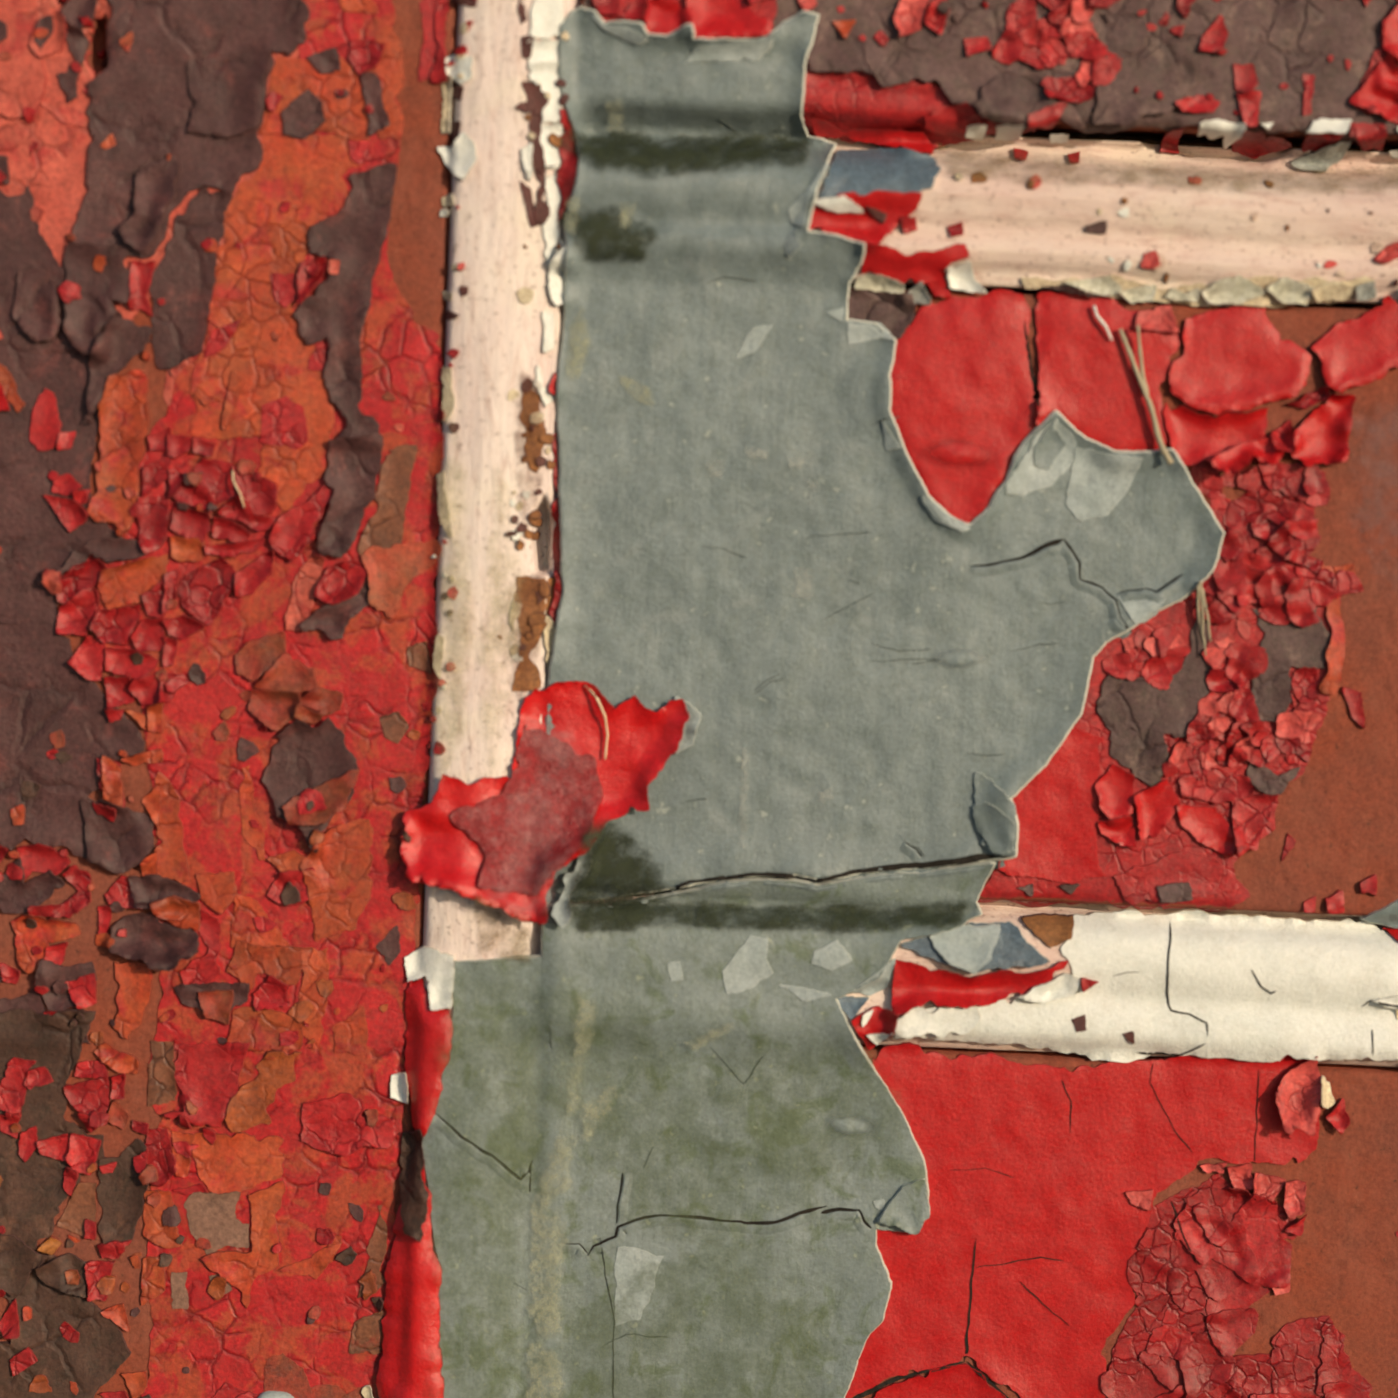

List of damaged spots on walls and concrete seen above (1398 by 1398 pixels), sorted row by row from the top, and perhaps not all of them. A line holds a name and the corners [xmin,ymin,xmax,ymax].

peeling [0,0,701,1398]
peeling [418,0,1398,1398]
crack [654,842,1005,902]
crack [1251,969,1276,994]
crack [1114,924,1208,1153]
crack [1363,1000,1398,1056]
crack [430,1114,544,1193]
crack [1062,1081,1072,1132]
crack [1252,1073,1260,1161]
crack [562,1146,872,1398]
crack [1171,1201,1196,1263]
crack [854,1242,1068,1398]